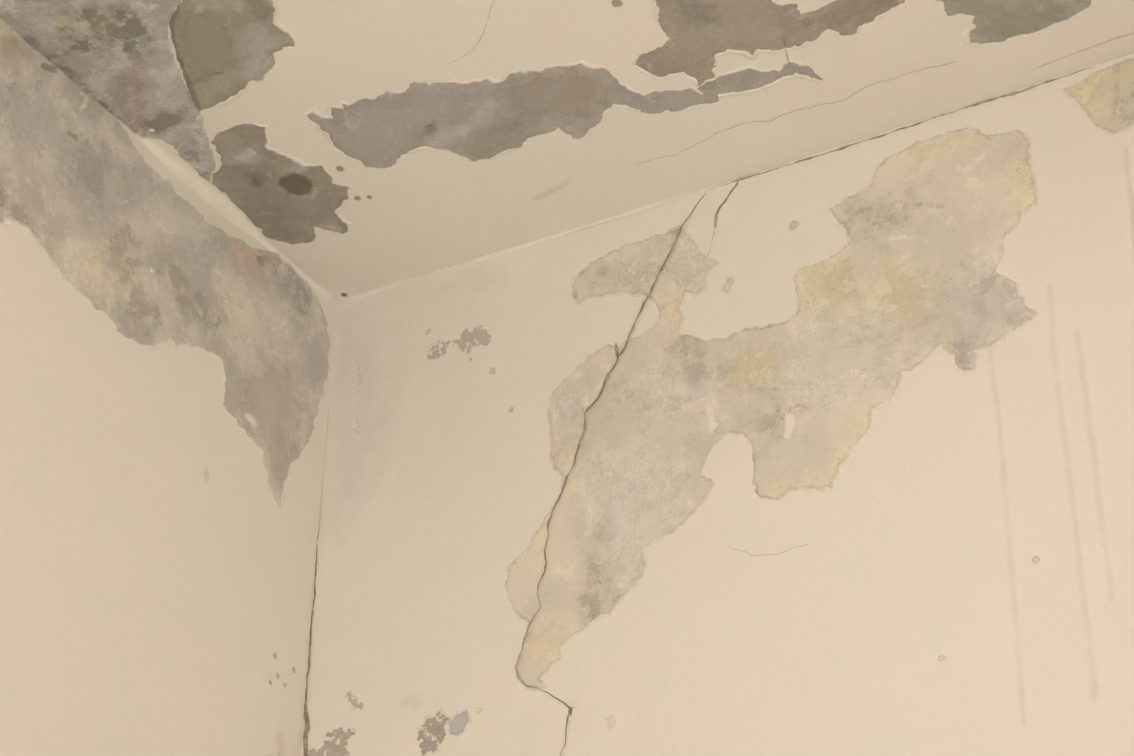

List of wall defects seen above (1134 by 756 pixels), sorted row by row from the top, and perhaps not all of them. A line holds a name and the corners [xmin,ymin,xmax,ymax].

peeling [0,0,906,509]
peeling [505,126,1041,691]
crack [515,32,1134,756]
spalling [934,0,1093,46]
peeling [1061,57,1134,137]